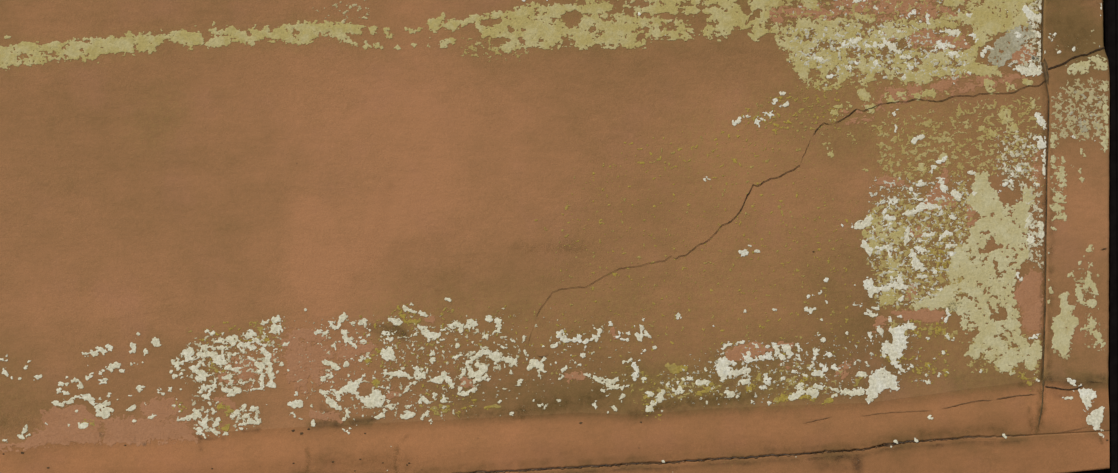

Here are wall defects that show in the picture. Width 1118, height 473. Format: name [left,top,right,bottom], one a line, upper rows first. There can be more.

peeling [0,0,401,71]
crack [475,0,1105,473]
peeling [792,268,862,325]
peeling [1051,245,1106,360]
peeling [0,355,42,381]
peeling [82,344,113,366]
peeling [1062,378,1105,438]